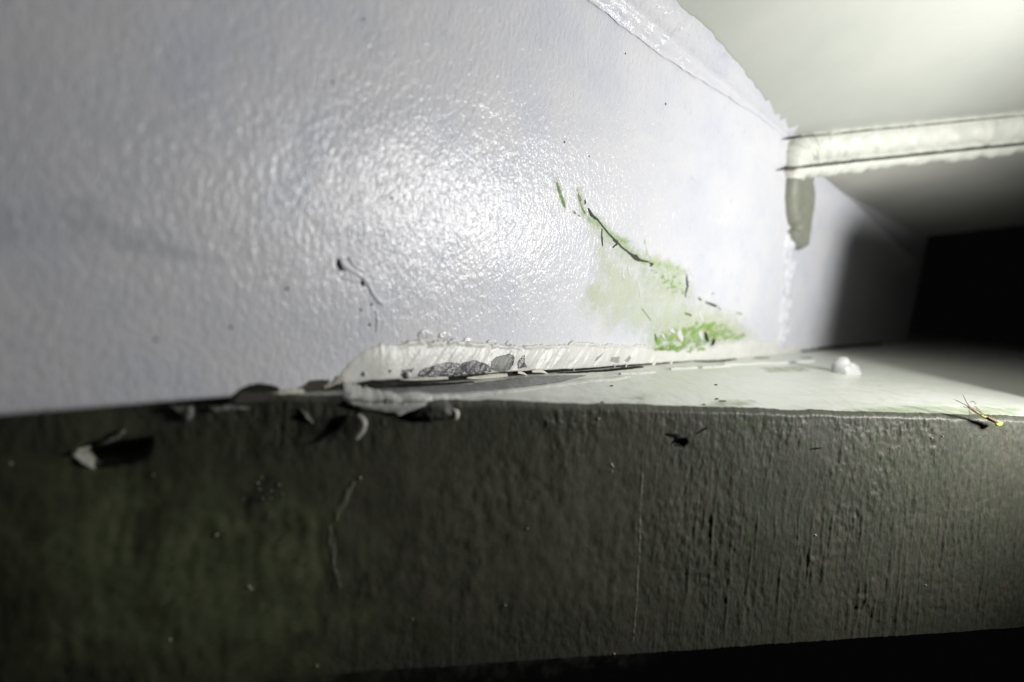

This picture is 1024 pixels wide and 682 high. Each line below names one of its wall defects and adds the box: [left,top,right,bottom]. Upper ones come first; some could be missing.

peeling [377,354,586,394]
spalling [70,429,154,470]